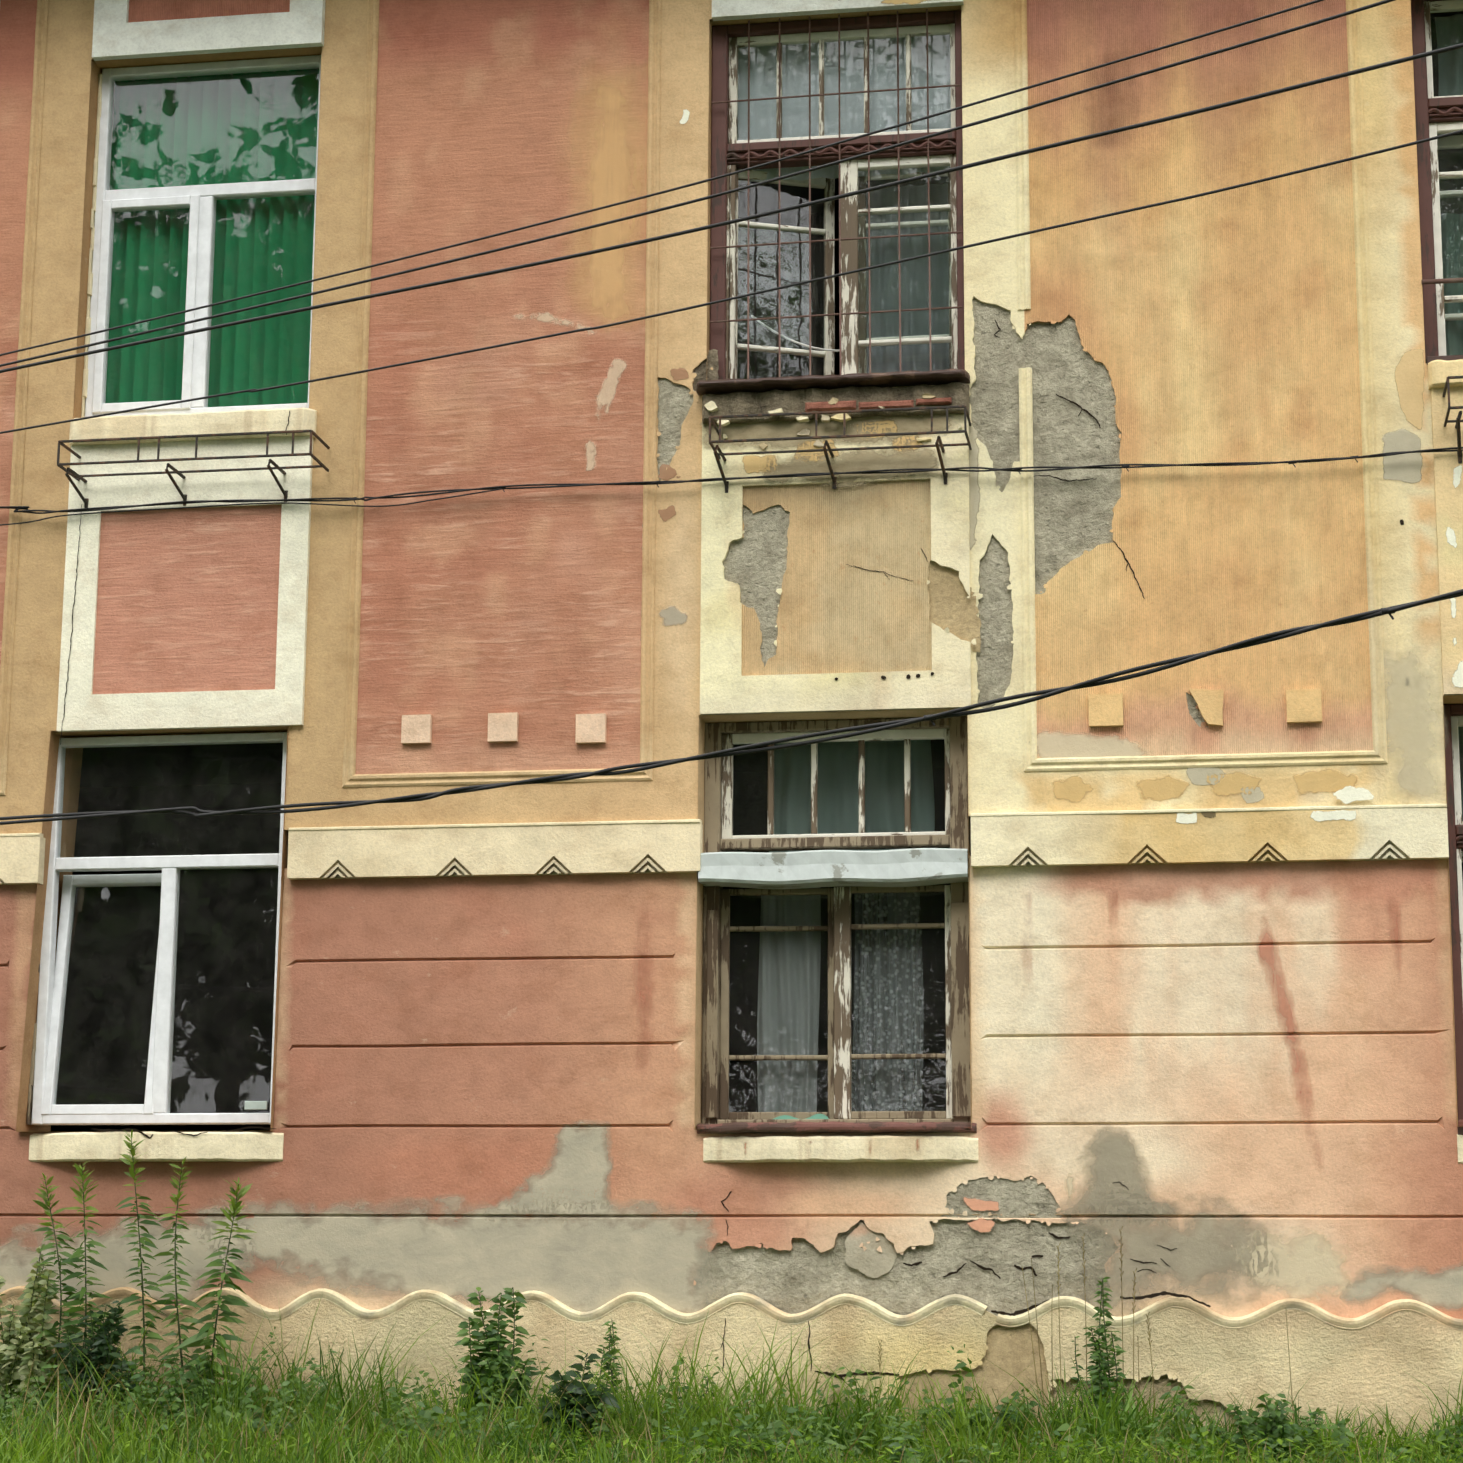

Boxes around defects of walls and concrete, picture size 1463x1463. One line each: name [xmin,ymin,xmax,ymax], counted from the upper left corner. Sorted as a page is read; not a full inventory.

spalling [656,349,719,481]
spalling [970,297,1122,594]
spalling [723,505,790,667]
crack [847,548,928,581]
spalling [927,535,1014,708]
crack [1113,541,1145,599]
peeling [1452,638,1463,687]
peeling [1137,767,1264,824]
peeling [1294,769,1374,821]
leakage [1259,932,1300,1073]
leakage [1062,1129,1463,1316]
spalling [694,1176,1239,1433]